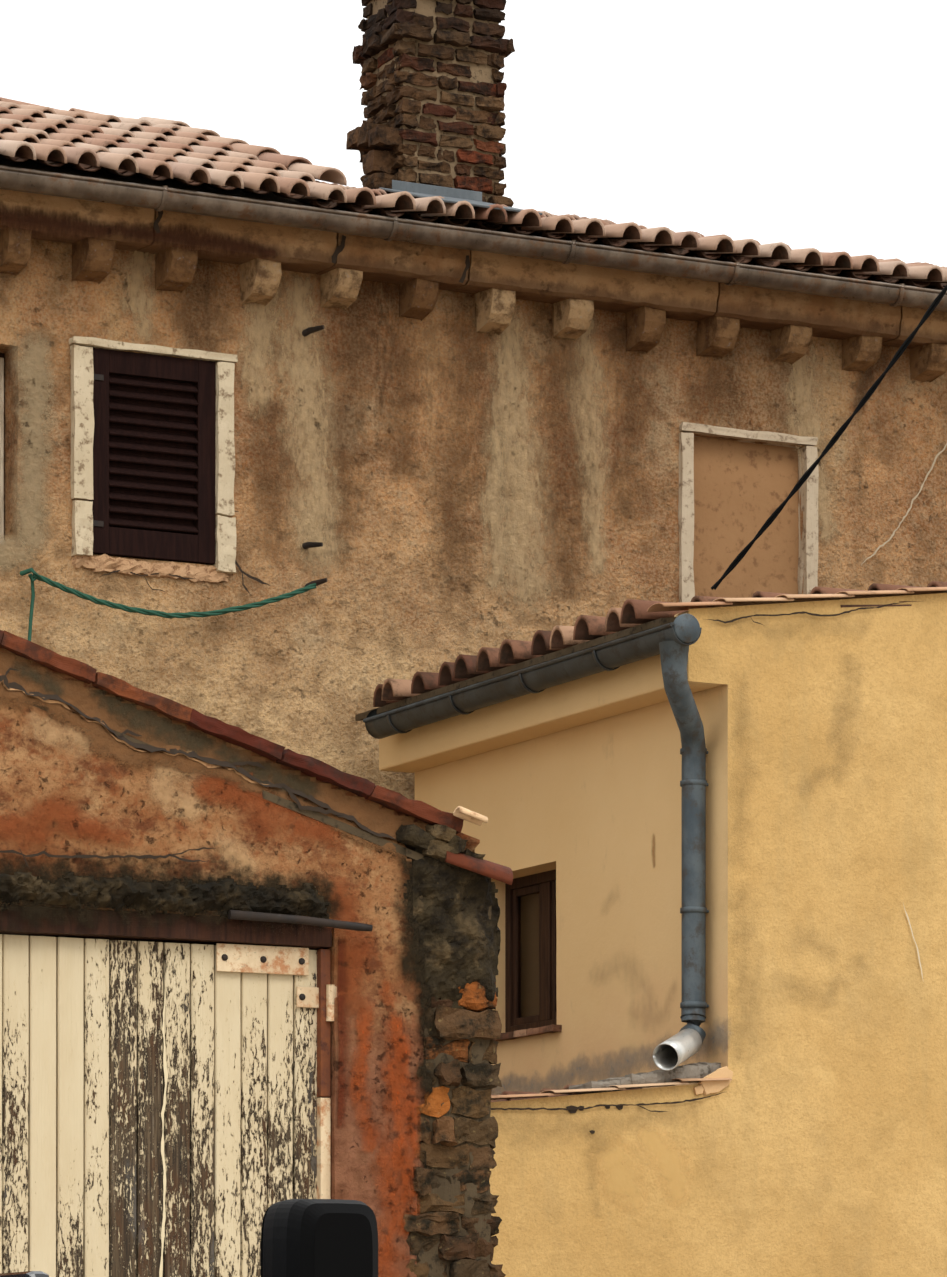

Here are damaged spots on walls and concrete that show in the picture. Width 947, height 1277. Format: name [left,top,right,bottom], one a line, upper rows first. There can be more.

damp [482,313,550,605]
damp [566,318,610,573]
damp [787,344,837,540]
crack [860,443,947,567]
crack [707,601,908,625]
crack [0,668,406,846]
damp [0,854,339,930]
damp [491,1052,655,1095]